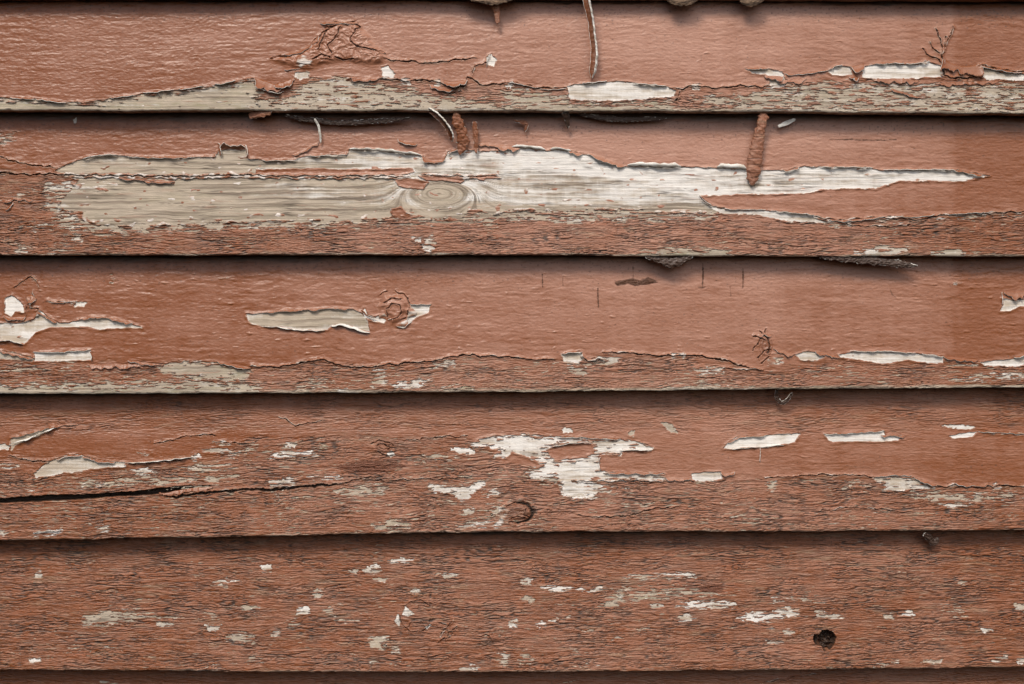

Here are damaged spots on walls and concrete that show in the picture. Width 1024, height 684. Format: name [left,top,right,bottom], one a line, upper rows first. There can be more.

peeling [0,58,1024,254]
peeling [0,295,263,394]
peeling [246,307,386,333]
peeling [759,333,1024,382]
peeling [34,442,251,490]
crack [0,433,473,505]
crack [278,415,327,429]
peeling [409,427,735,501]
peeling [724,433,800,462]
peeling [825,431,905,442]
peeling [428,481,502,529]
peeling [520,572,843,644]